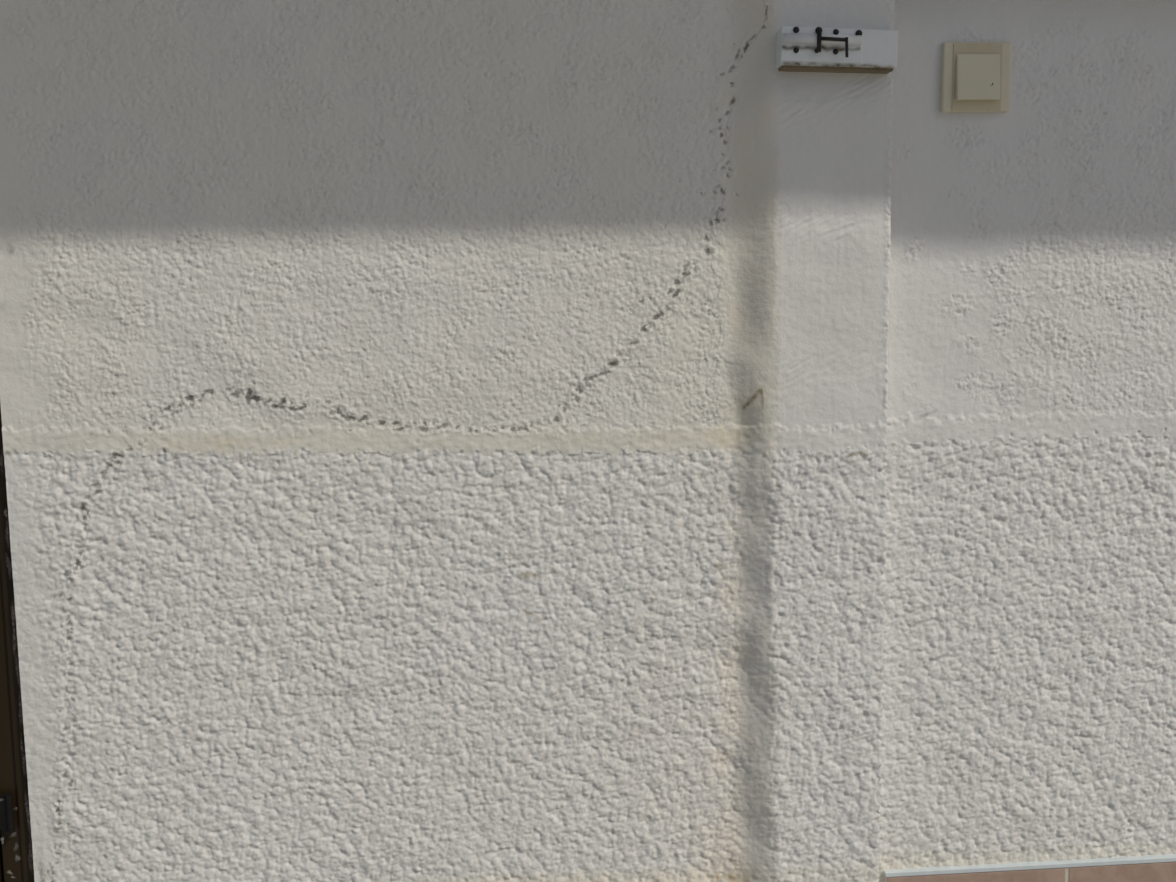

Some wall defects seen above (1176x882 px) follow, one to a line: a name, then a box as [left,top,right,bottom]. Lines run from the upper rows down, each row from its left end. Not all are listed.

crack [233,389,304,410]